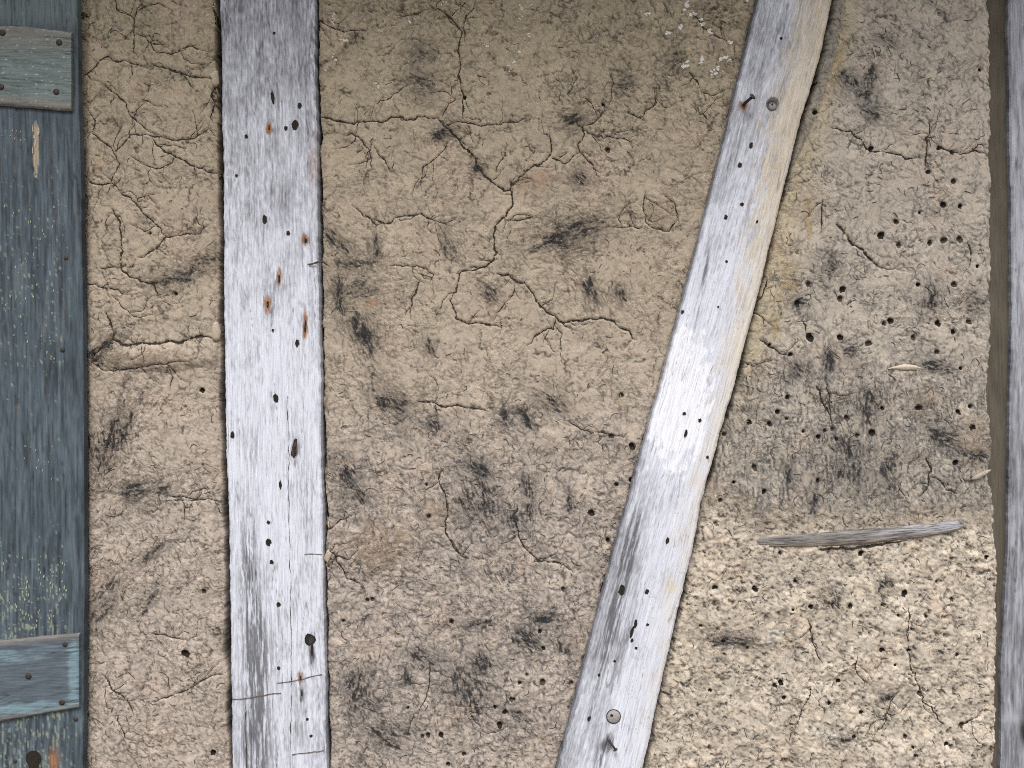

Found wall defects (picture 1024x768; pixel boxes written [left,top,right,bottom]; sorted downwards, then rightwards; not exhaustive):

crack [831,111,988,169]
crack [85,0,224,391]
crack [319,0,723,356]
crack [804,200,898,270]
crack [418,382,495,425]
crack [426,471,473,575]
crack [501,507,570,570]